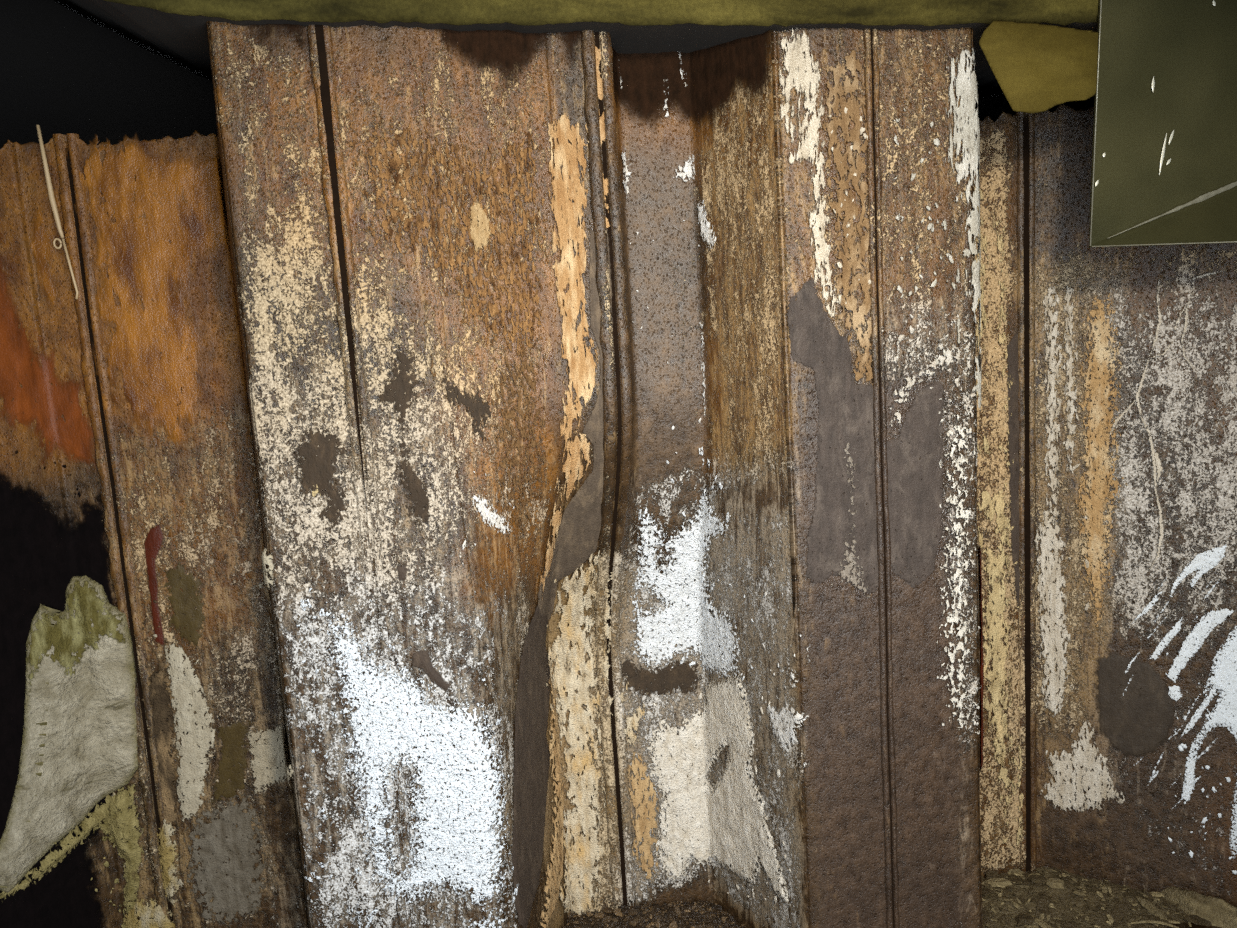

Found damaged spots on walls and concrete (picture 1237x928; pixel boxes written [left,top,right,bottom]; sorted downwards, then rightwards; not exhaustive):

corrosion [78,139,228,443]
damp [297,588,519,928]
peeling [512,46,613,928]
damp [540,447,791,928]
damp [698,200,716,249]
peeling [786,49,976,594]